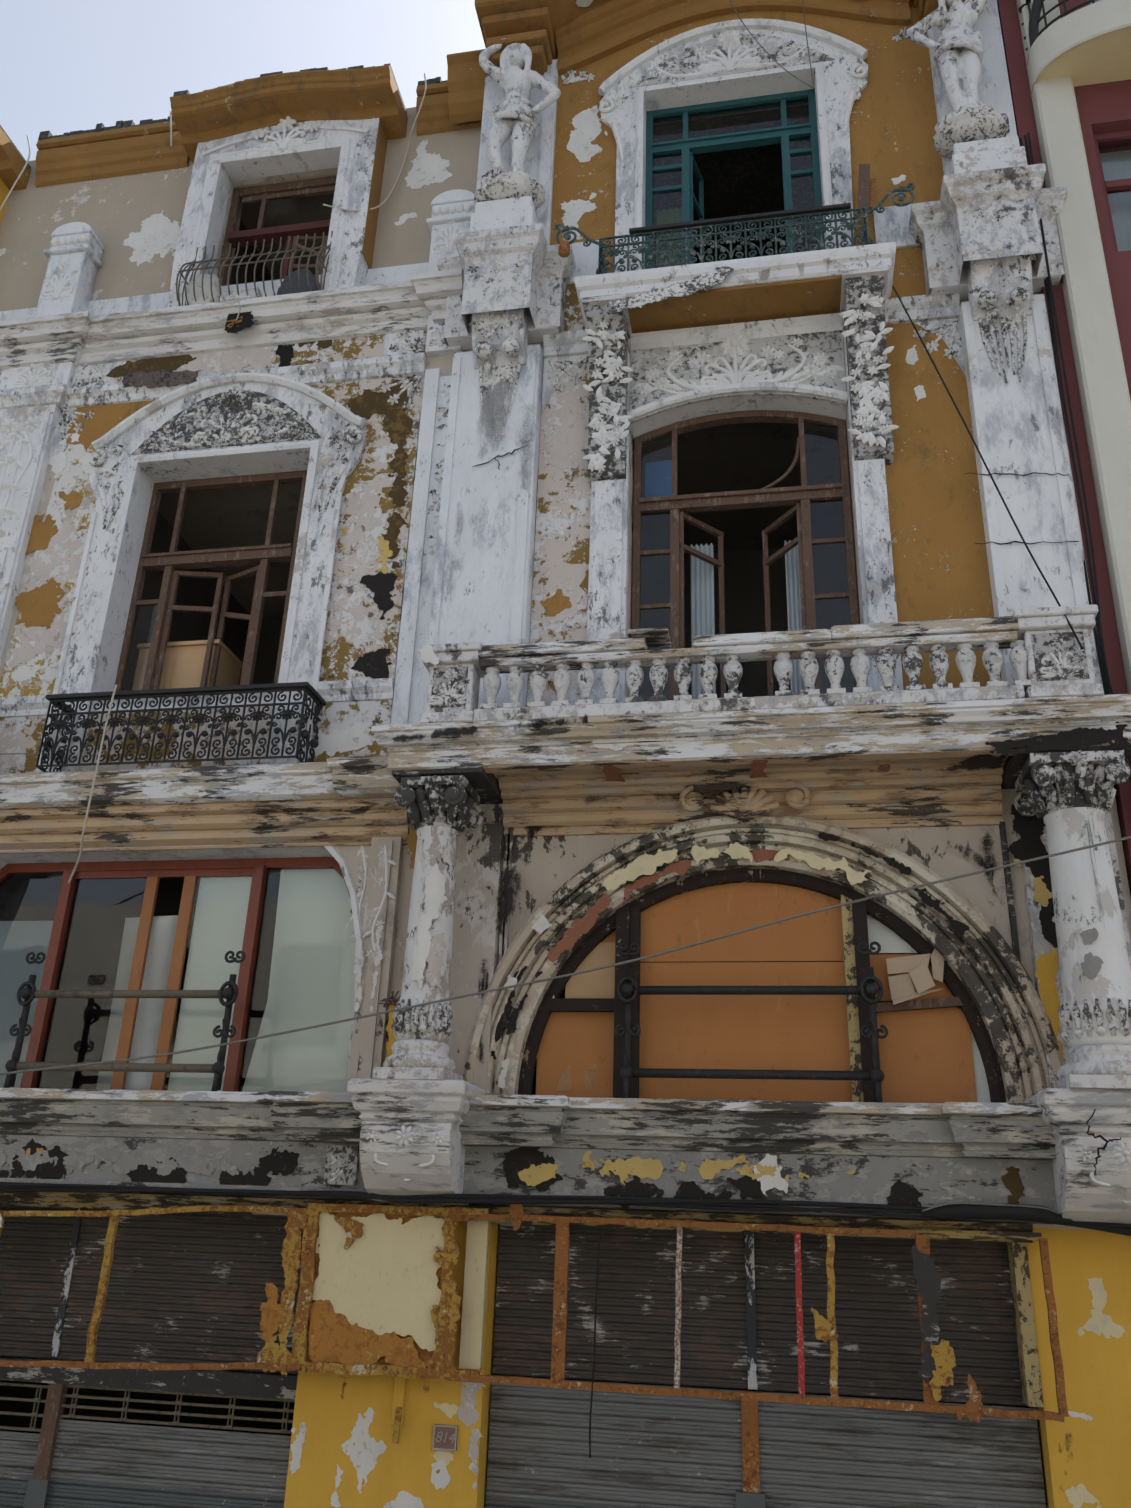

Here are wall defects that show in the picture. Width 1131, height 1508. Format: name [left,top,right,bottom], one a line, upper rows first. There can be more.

peeling [404,140,453,189]
peeling [566,105,602,162]
peeling [560,193,597,241]
peeling [8,354,199,673]
peeling [333,375,416,679]
peeling [540,558,587,626]
peeling [491,831,969,1089]
peeling [503,1147,563,1192]
peeling [582,1151,810,1209]
crack [1086,1109,1121,1175]
peeling [330,1407,387,1508]
peeling [384,1382,485,1508]